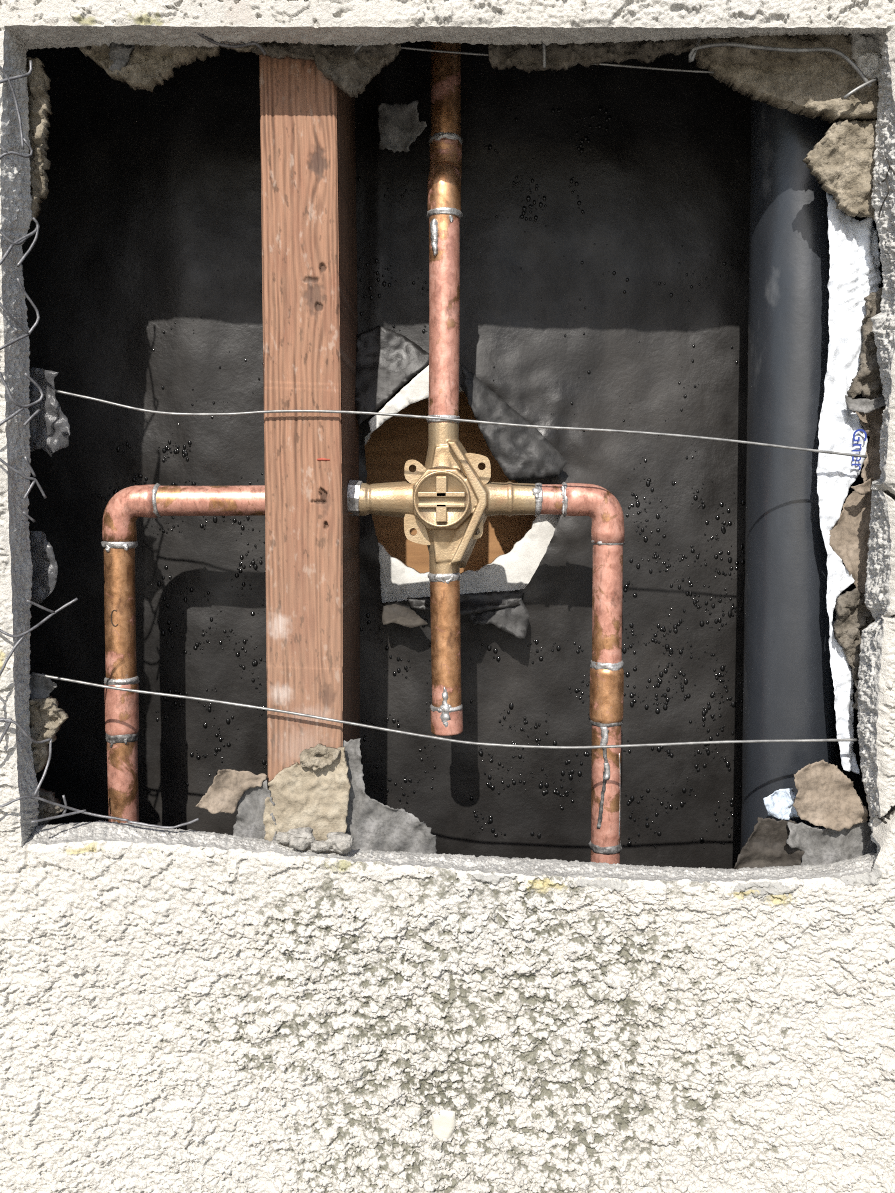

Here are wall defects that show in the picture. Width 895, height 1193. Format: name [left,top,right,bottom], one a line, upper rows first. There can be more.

spalling [25,56,52,221]
spalling [80,41,402,98]
spalling [487,33,883,220]
spalling [847,287,886,408]
spalling [833,588,875,710]
spalling [29,696,69,773]
spalling [37,788,65,826]
spalling [263,743,351,846]